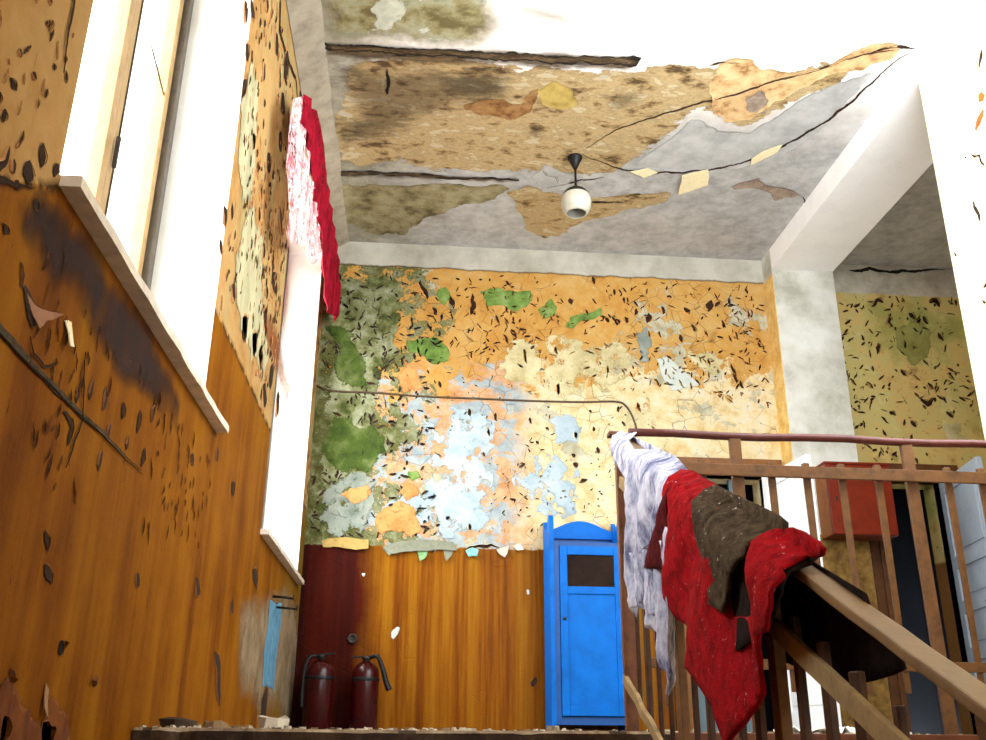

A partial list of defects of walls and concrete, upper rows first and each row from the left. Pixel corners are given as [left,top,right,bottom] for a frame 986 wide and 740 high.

peeling [0,45,49,122]
peeling [0,131,60,191]
peeling [45,20,68,84]
crack [340,170,519,182]
flaking render [333,43,900,238]
crack [543,45,916,204]
peeling [965,37,985,134]
water stain [24,198,178,411]
crack [849,266,943,274]
peeling [304,272,771,561]
peeling [840,296,974,461]
peeling [0,668,70,740]